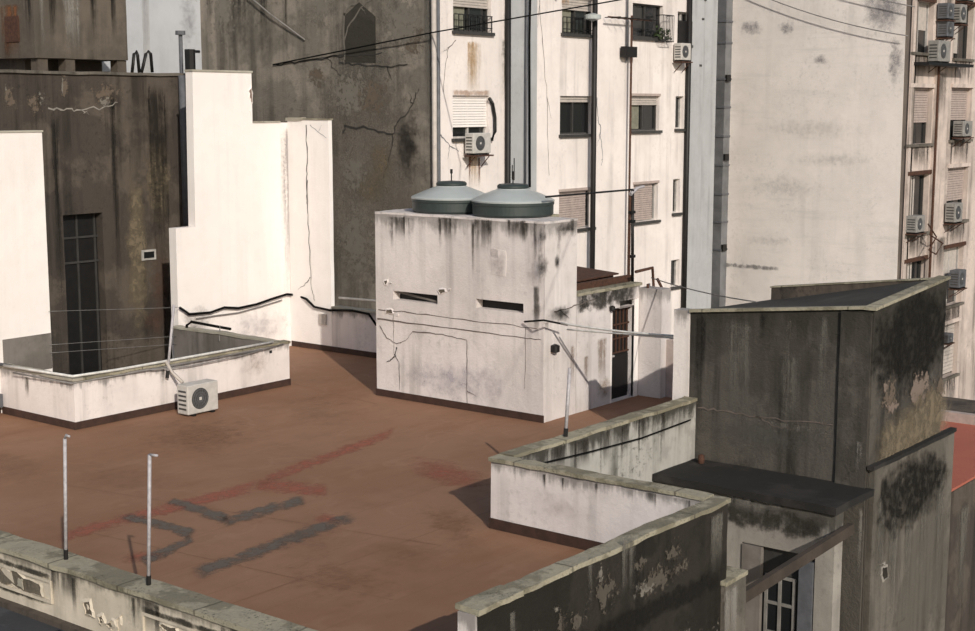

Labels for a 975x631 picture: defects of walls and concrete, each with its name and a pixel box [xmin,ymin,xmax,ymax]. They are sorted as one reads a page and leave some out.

crack [48,102,117,114]
crack [277,0,419,293]
water stain [472,220,491,248]
water stain [508,220,545,250]
crack [377,309,541,390]
water stain [873,292,959,389]
peeling [881,371,945,420]
water stain [881,378,955,460]
water stain [877,454,947,567]
spalling [0,567,45,597]
peeling [589,561,620,614]
peeling [633,537,689,597]